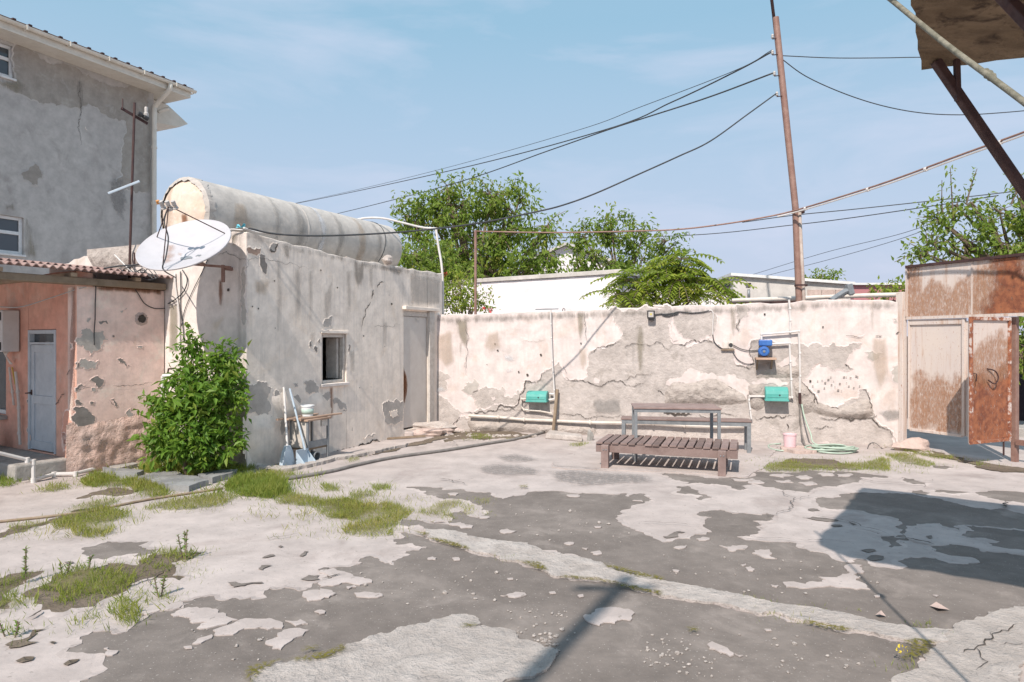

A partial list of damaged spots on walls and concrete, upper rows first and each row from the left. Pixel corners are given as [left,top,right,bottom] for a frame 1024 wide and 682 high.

peeling [0,44,151,194]
corrosion [908,257,1024,317]
peeling [61,317,116,452]
peeling [244,380,290,436]
peeling [382,398,404,426]
peeling [437,303,895,445]
corrosion [910,332,1008,441]
crack [964,623,1022,667]